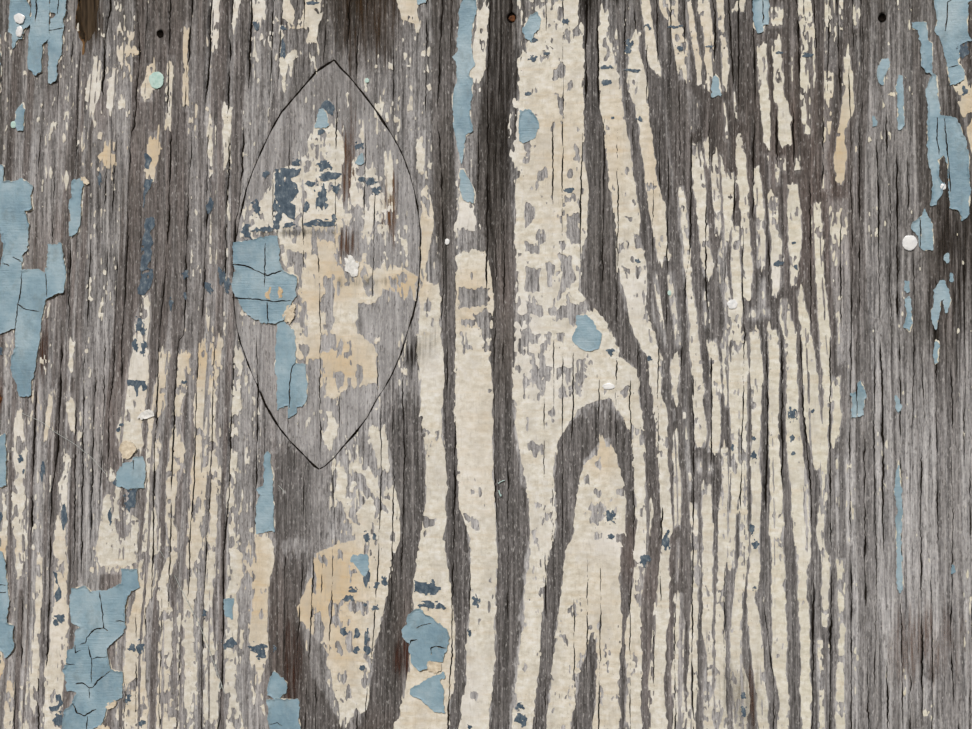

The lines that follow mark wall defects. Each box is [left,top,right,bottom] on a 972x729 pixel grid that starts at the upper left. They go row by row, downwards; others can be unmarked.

peeling [0,0,67,93]
peeling [210,0,220,51]
peeling [232,0,266,35]
peeling [279,0,322,93]
peeling [452,0,489,238]
peeling [911,0,972,251]
peeling [0,26,301,729]
crack [14,0,453,729]
peeling [205,100,498,729]
crack [446,348,471,729]
crack [478,0,513,623]
peeling [931,253,954,365]